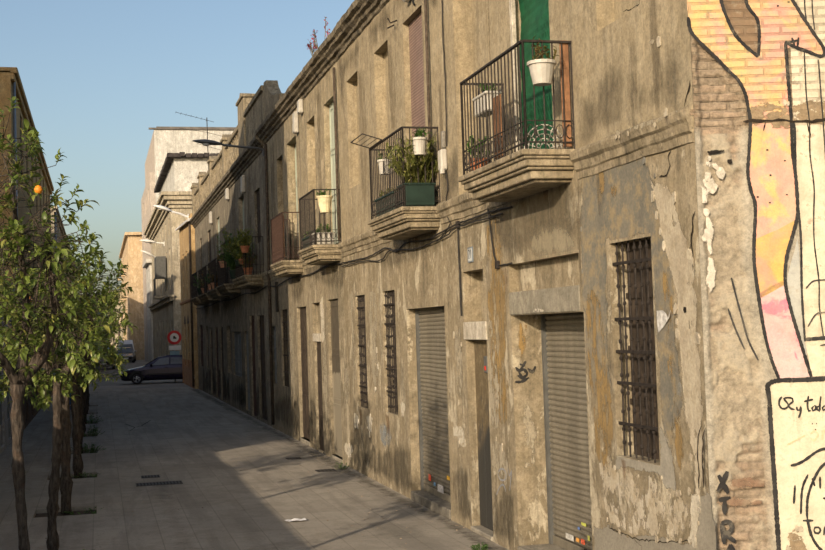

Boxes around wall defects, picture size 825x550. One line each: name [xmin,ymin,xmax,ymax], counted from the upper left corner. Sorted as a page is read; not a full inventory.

peeling [701,156,726,294]
peeling [580,157,704,548]
leakage [365,449,410,488]
spalling [786,525,806,550]